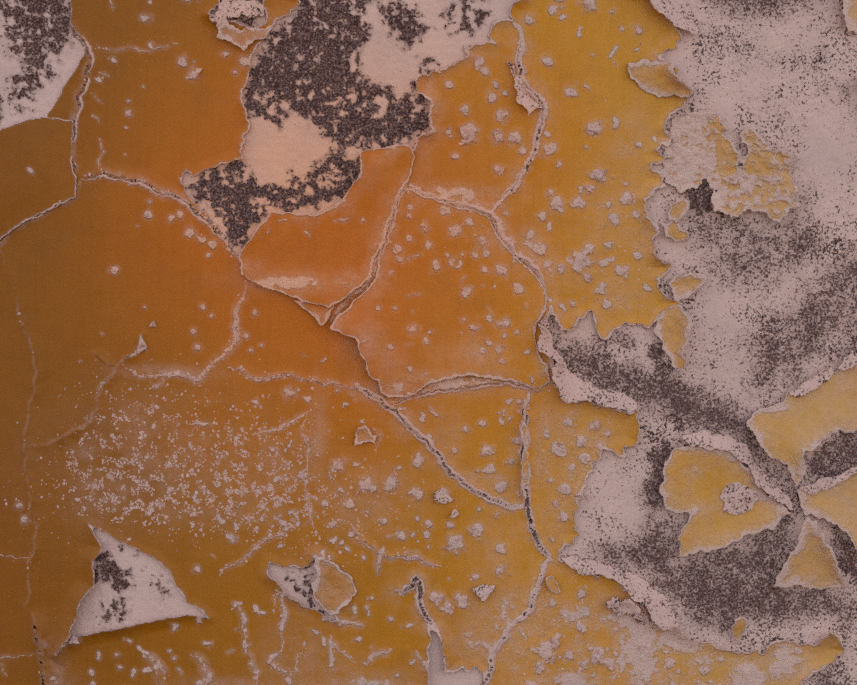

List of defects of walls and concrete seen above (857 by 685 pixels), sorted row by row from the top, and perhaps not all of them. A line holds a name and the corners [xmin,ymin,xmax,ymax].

peeling [0,0,87,240]
crack [0,22,239,258]
crack [330,23,548,323]
peeling [137,335,147,354]
peeling [181,0,857,685]
crack [1,625,45,685]
peeling [67,528,206,643]
crack [123,280,553,685]